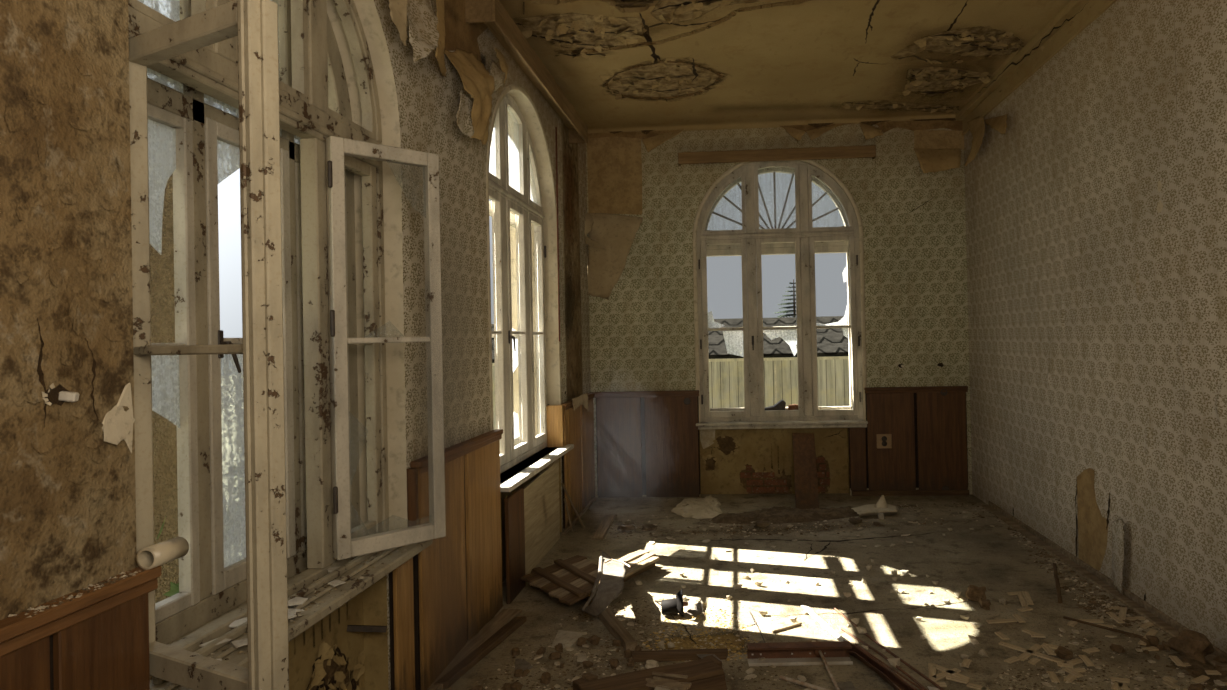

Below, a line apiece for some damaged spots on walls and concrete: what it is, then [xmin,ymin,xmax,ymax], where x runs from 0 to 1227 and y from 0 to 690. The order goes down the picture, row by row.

peeling [444,0,488,62]
peeling [515,0,773,59]
crack [639,13,729,64]
crack [853,0,880,76]
peeling [842,25,1025,126]
flaking render [701,434,795,494]
flaking render [307,641,366,690]